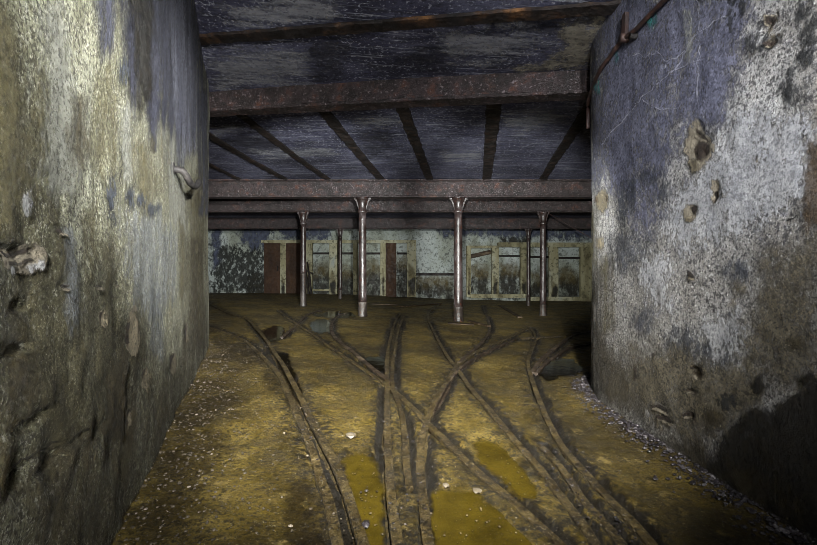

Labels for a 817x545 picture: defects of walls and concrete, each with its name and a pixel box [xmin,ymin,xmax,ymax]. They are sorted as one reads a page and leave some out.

water stain [250,148,339,159]
spalling [683,118,715,173]
spalling [711,179,719,203]
spalling [683,204,697,222]
spalling [0,242,48,275]
water stain [0,0,264,545]
water stain [647,372,817,539]